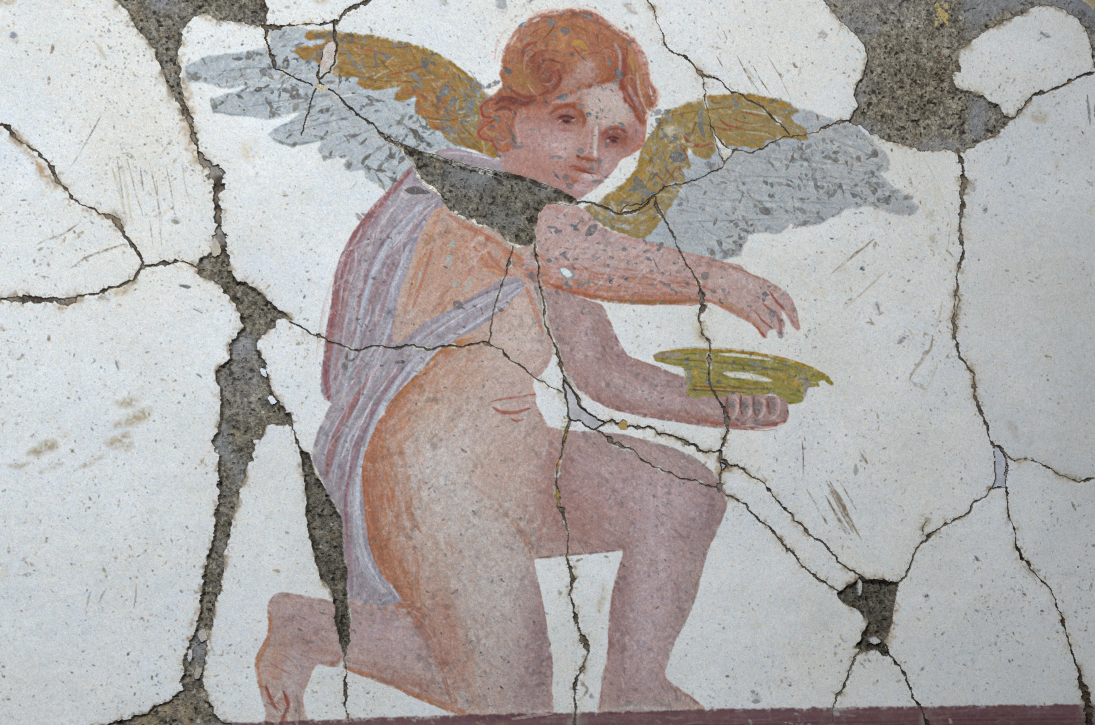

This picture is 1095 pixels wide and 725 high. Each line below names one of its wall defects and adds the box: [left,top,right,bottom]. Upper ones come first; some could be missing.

crack [0,108,227,306]
crack [261,0,399,147]
flaking render [115,0,1095,305]
crack [1012,72,1095,121]
flaking render [109,252,293,725]
flaking render [300,451,356,654]
crack [289,0,864,725]
peeling [685,355,801,427]
peeling [742,286,799,339]
flaking render [837,576,899,657]
crack [832,644,930,725]
crack [897,148,1095,725]